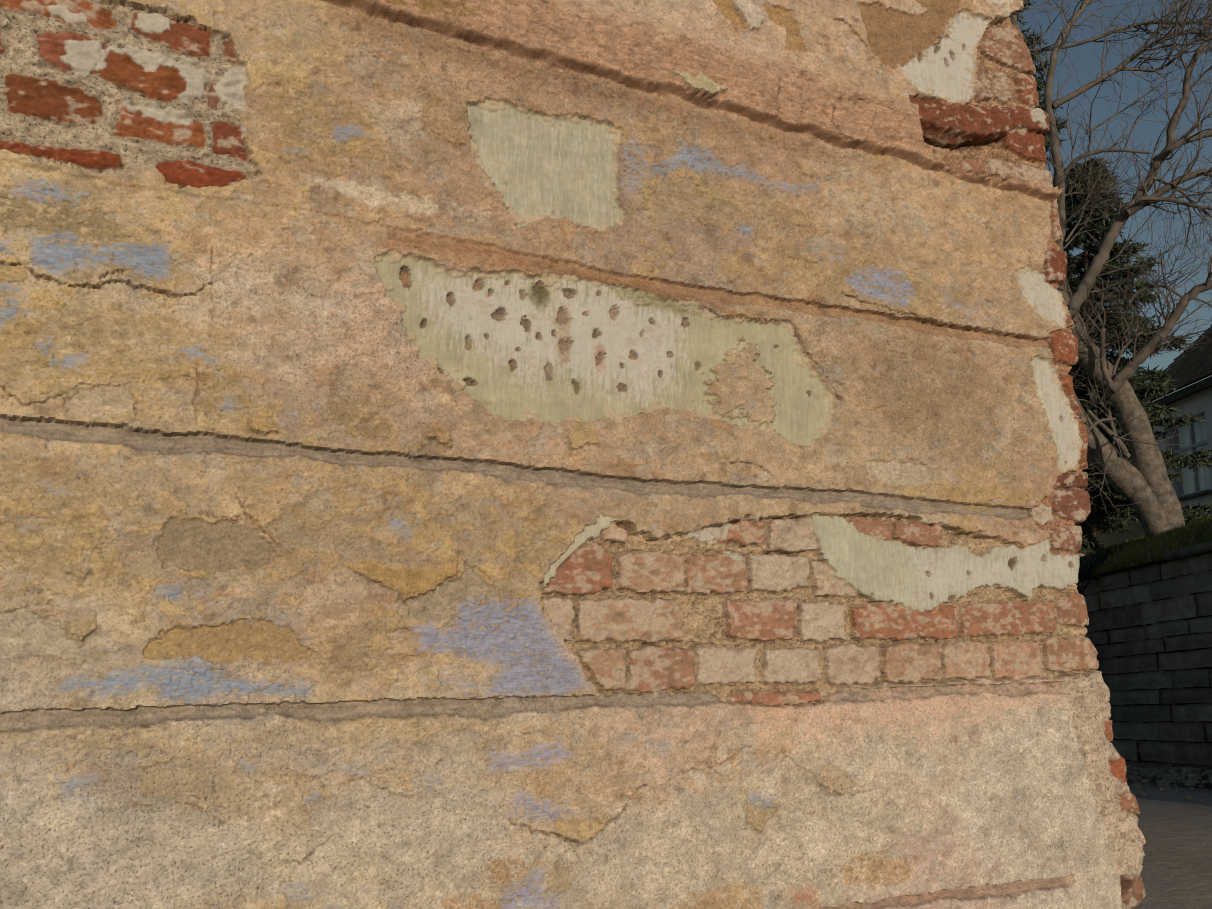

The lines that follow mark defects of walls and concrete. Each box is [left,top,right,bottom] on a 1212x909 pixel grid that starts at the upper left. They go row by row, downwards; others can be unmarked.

flaking render [0,0,263,189]
peeling [466,96,628,232]
crack [0,241,216,428]
peeling [375,249,844,447]
flaking render [537,0,1146,909]
peeling [144,620,319,664]
crack [510,739,909,895]